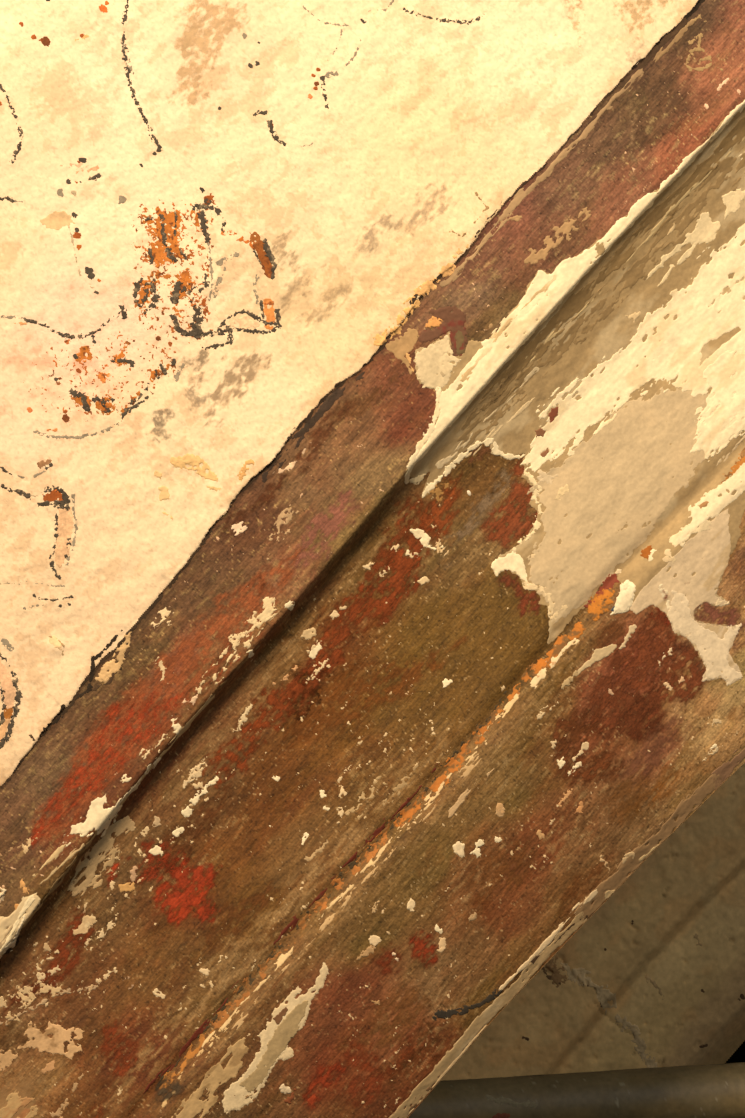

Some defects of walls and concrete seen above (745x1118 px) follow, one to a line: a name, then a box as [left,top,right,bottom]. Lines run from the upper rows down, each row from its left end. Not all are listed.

peeling [385,107,745,719]
peeling [273,628,331,686]
peeling [0,597,295,964]
peeling [448,769,494,818]
peeling [495,803,505,817]
peeling [550,740,589,814]
peeling [452,836,502,858]
peeling [357,935,382,960]
peeling [435,924,447,953]
peeling [0,943,134,1074]
peeling [0,1082,38,1118]